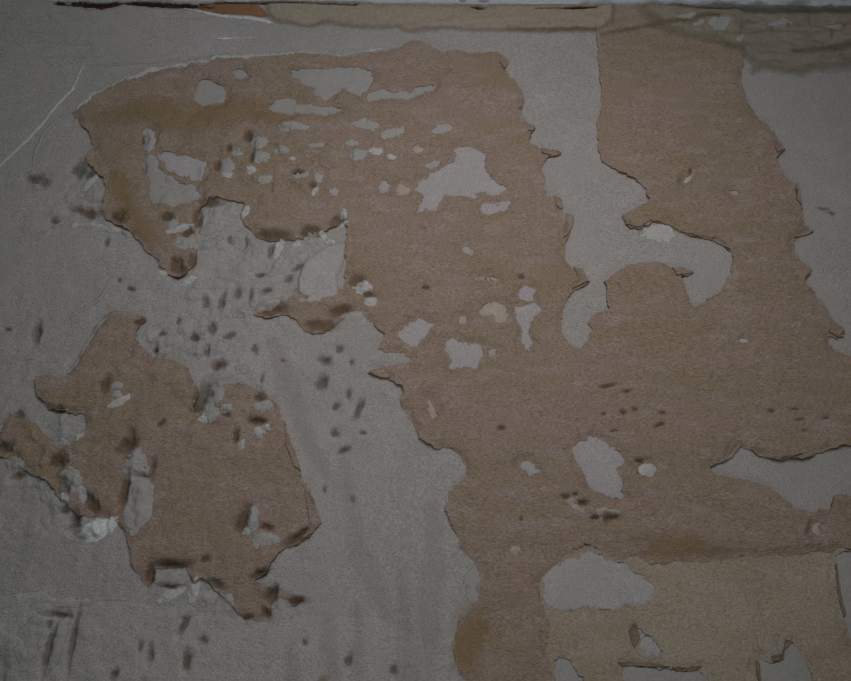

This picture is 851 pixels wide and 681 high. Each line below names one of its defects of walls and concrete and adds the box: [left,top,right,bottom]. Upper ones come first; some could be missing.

peeling [267,0,614,33]
peeling [643,2,851,72]
flaking render [193,79,227,107]
flaking render [141,154,202,207]
flaking render [156,151,207,182]
flaking render [414,147,507,213]
flaking render [308,320,333,330]
flaking render [515,302,542,352]
flaking render [444,338,484,370]
peeling [0,310,321,622]
flaking render [572,435,625,500]
peeling [539,545,851,681]